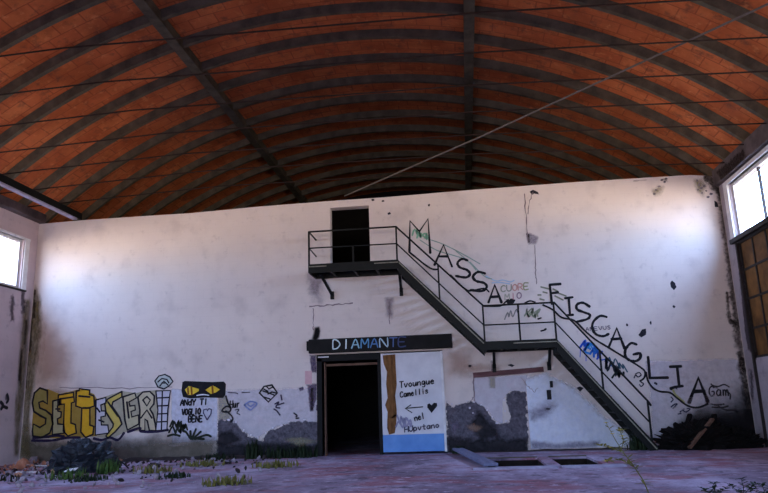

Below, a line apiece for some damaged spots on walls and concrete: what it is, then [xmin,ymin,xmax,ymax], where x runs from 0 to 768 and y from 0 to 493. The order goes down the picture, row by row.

damp [5,290,40,456]
flaking render [216,419,317,456]
flaking render [446,390,627,470]
damp [714,193,757,399]